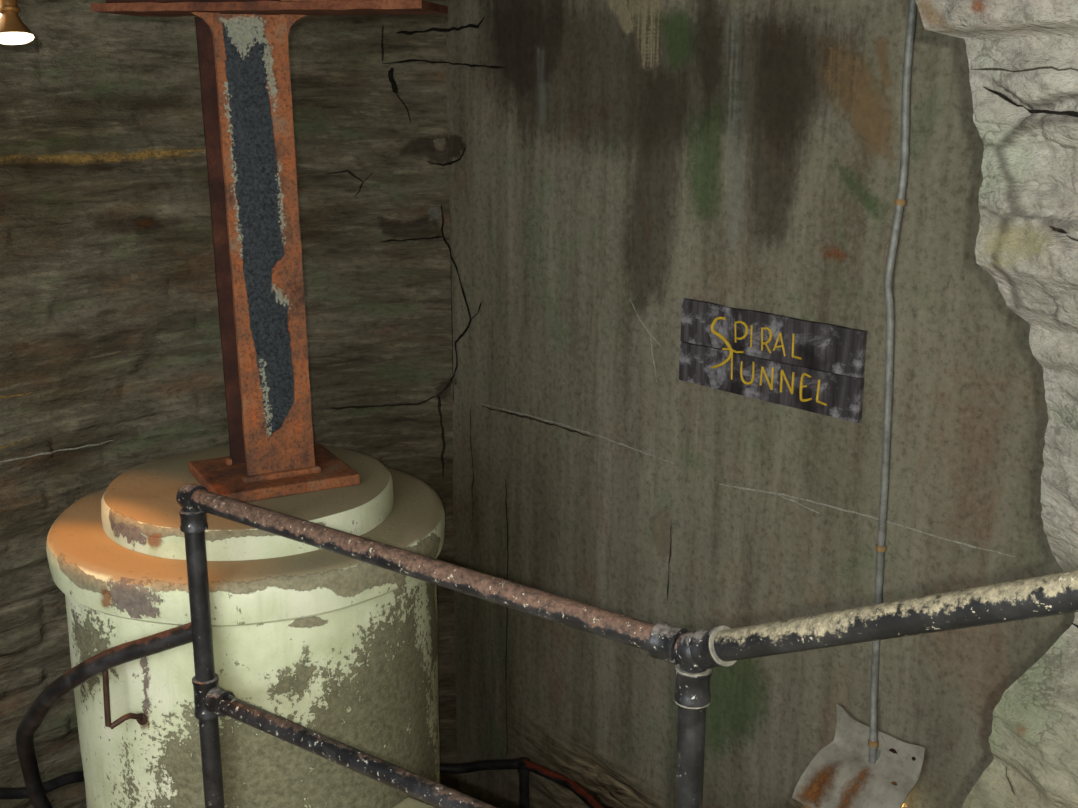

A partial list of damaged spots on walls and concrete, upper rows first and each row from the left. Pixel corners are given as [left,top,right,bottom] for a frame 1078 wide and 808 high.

crack [381,17,506,122]
damp [607,0,662,67]
crack [970,66,1078,117]
crack [327,170,371,197]
crack [1049,226,1078,241]
crack [325,205,674,499]
peeling [109,509,184,547]
peeling [205,529,279,542]
peeling [57,553,189,665]
peeling [208,562,440,783]
peeling [108,700,205,808]
peeling [218,716,437,808]